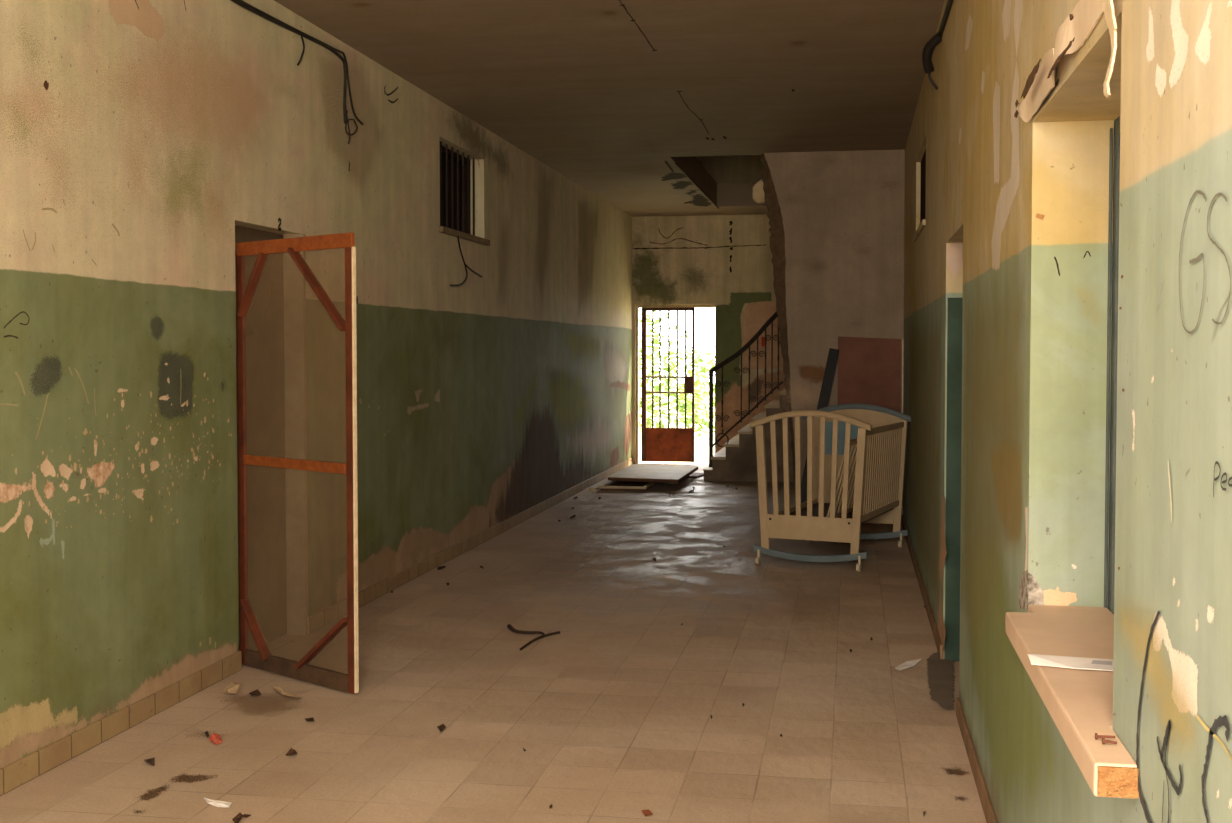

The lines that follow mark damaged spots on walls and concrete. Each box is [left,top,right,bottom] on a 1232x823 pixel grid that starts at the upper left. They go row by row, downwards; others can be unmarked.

crack [619,0,655,51]
peeling [1146,0,1212,97]
flaking render [981,0,1117,271]
spalling [660,172,711,207]
water stain [489,192,628,528]
peeling [0,363,221,538]
spalling [1019,507,1077,609]
peeling [0,642,238,769]
peeling [1153,614,1198,715]
peeling [1195,605,1214,631]